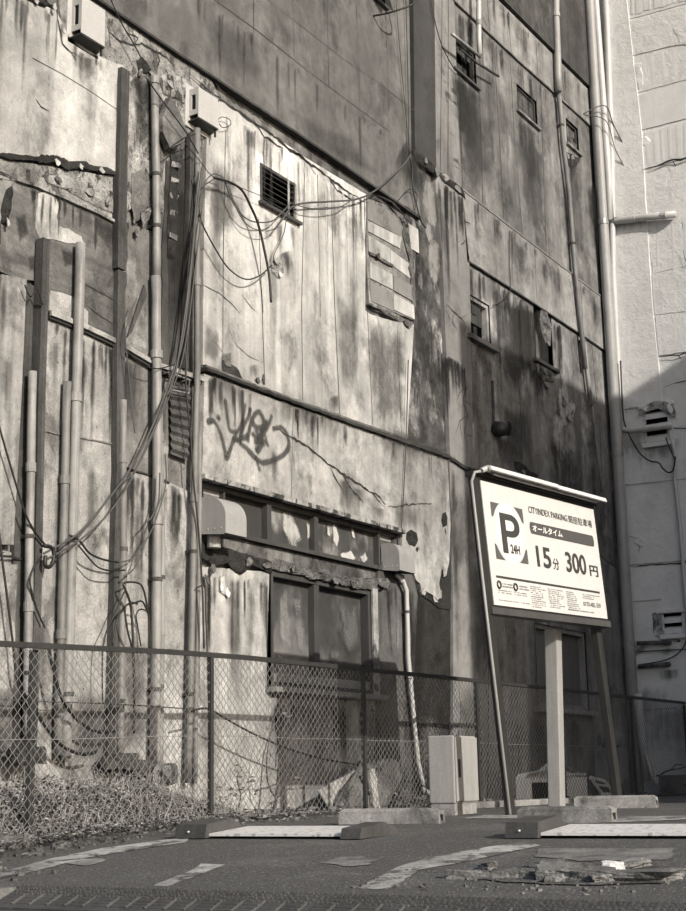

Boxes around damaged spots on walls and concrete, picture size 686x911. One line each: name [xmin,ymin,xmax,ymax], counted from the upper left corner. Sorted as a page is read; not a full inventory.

damp [2,0,28,38]
damp [459,15,504,70]
spalling [0,153,115,213]
damp [438,186,464,278]
damp [591,187,599,247]
damp [419,322,466,414]
crack [456,382,472,451]
crack [277,415,432,508]
peeling [283,514,310,545]
spalling [201,542,392,598]
peeling [328,525,367,562]
peeling [415,552,451,610]